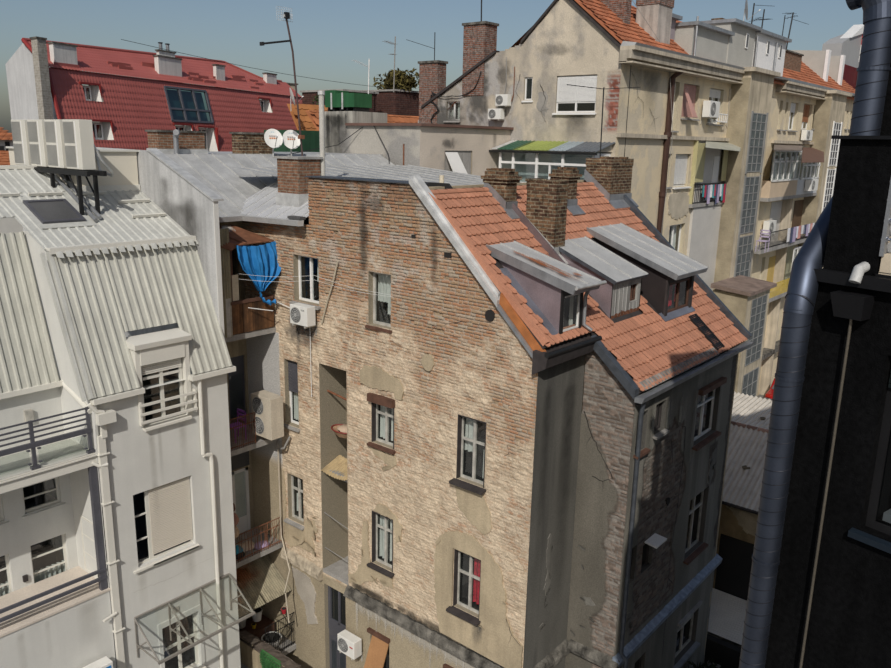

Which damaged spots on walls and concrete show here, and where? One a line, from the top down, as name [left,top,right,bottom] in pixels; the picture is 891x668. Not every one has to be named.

crack [584,411,613,482]